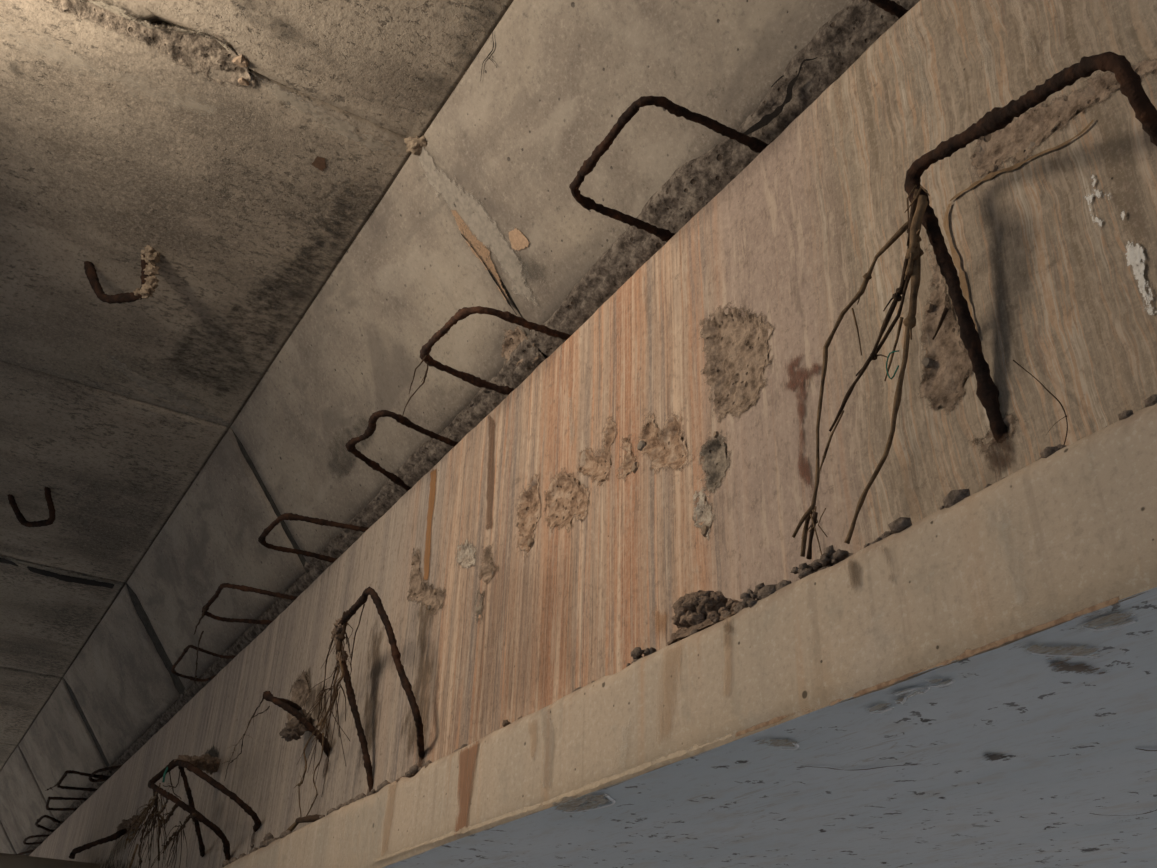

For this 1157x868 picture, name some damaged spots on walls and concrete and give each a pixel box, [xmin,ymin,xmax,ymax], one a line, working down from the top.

flaking render [451,210,508,300]
flaking render [508,227,529,250]
spalling [501,326,540,366]
spalling [516,303,775,556]
rust [784,357,822,488]
spalling [263,670,330,756]
spalling [340,660,374,792]
spalling [338,586,425,760]
spalling [69,828,127,859]
spalling [148,759,261,861]
rust [454,741,479,835]